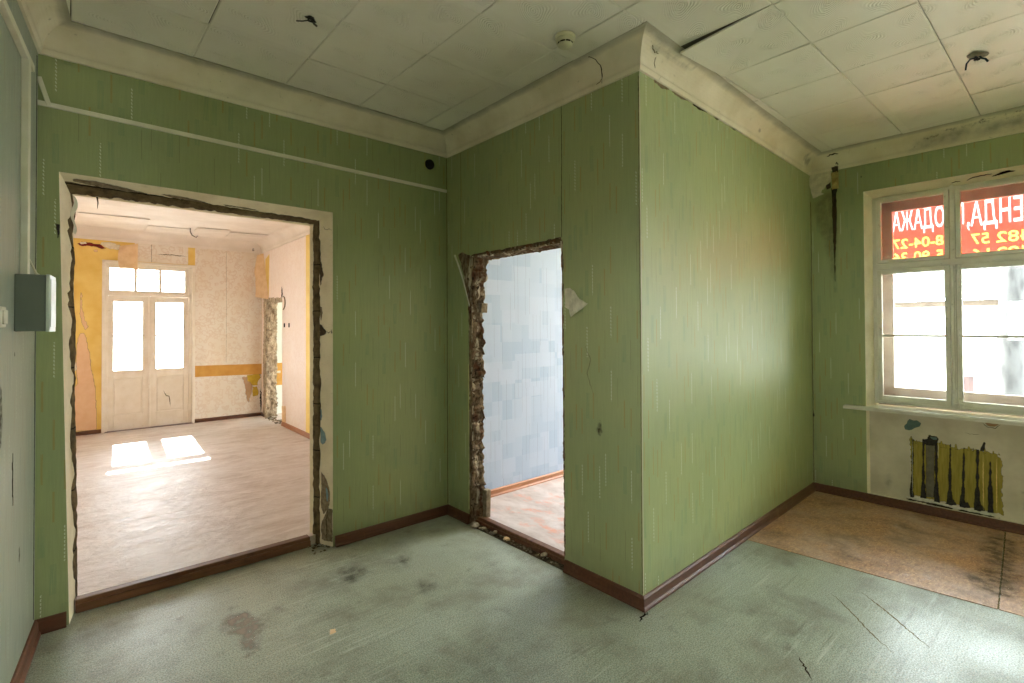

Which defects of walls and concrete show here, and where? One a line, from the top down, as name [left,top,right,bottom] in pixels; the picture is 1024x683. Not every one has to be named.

flaking render [56,179,333,596]
spalling [906,496,996,516]